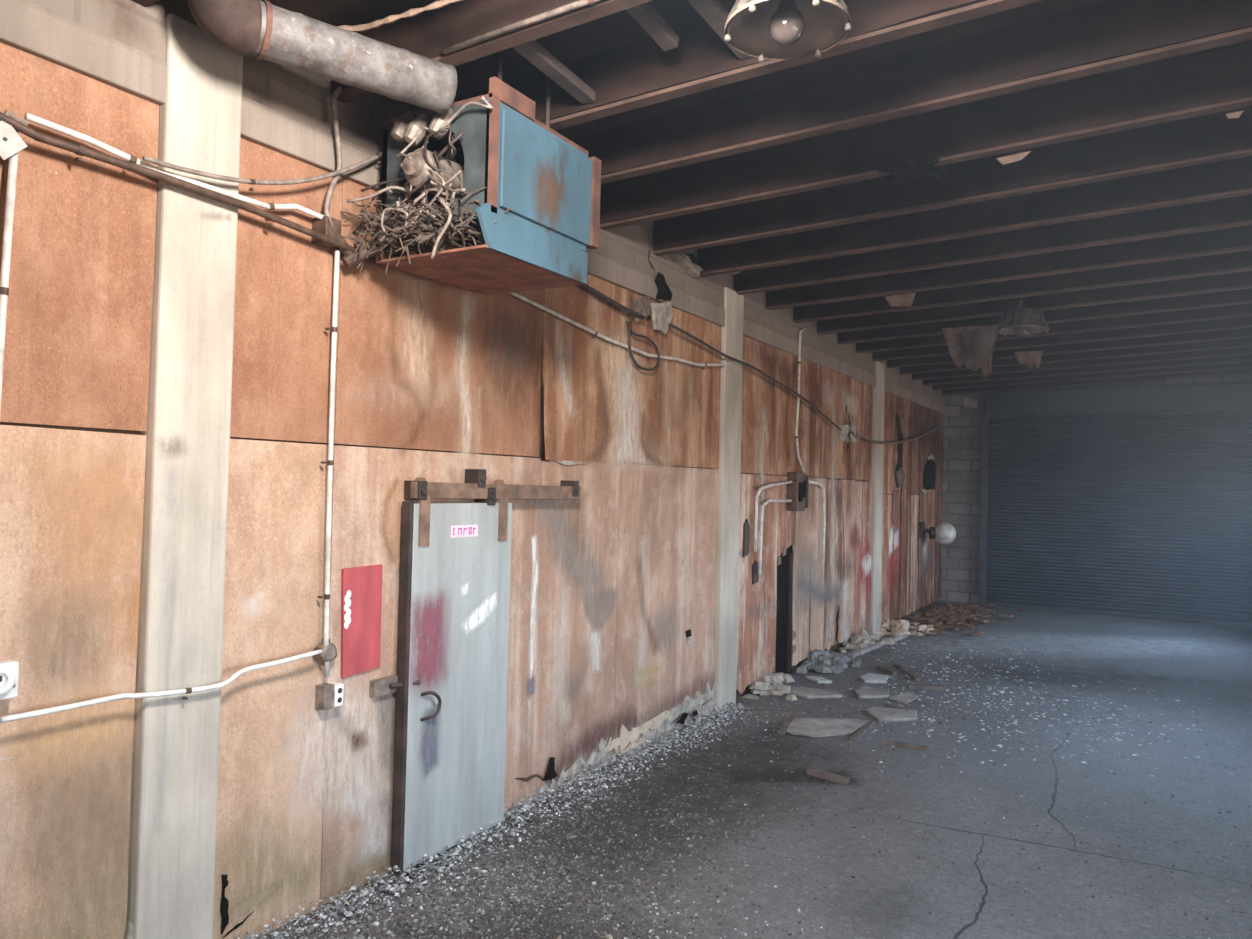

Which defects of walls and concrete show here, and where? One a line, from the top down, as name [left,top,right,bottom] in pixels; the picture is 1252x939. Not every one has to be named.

water stain [404,287,429,384]
water stain [460,299,471,452]
water stain [555,325,572,411]
water stain [601,333,671,465]
crack [867,732,1248,939]